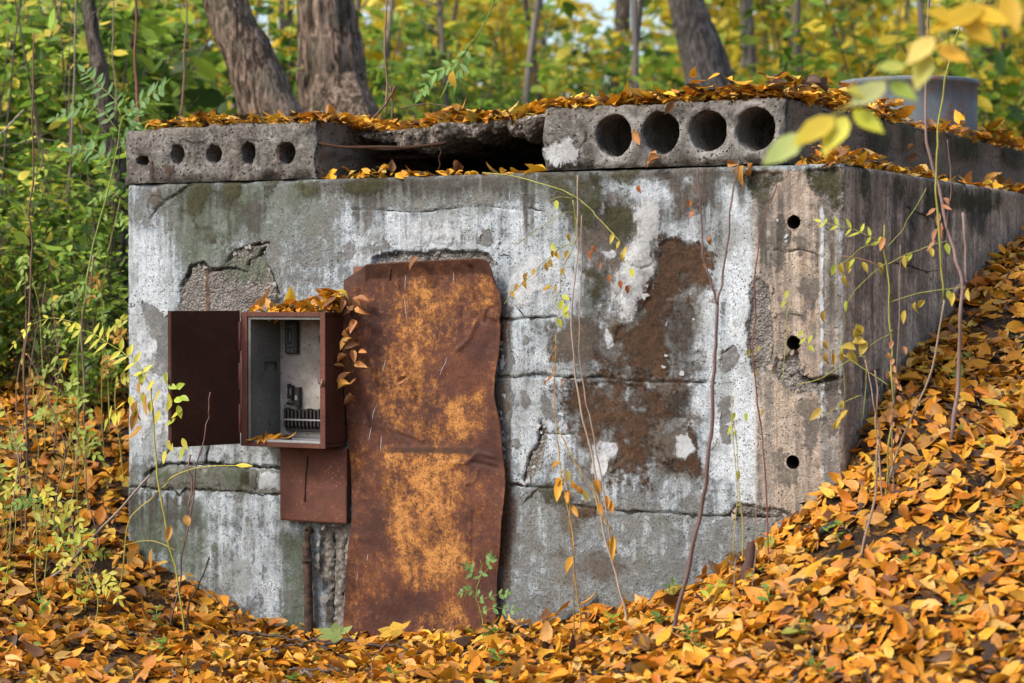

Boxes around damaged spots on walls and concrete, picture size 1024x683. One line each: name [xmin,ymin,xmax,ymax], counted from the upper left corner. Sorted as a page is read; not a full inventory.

damp [757,195,790,269]
damp [856,169,919,286]
damp [935,185,952,245]
damp [967,189,988,238]
spalling [128,242,283,382]
damp [811,204,844,418]
rust [494,375,510,414]
rust [499,462,516,577]
crack [511,483,554,503]
spalling [312,522,349,628]